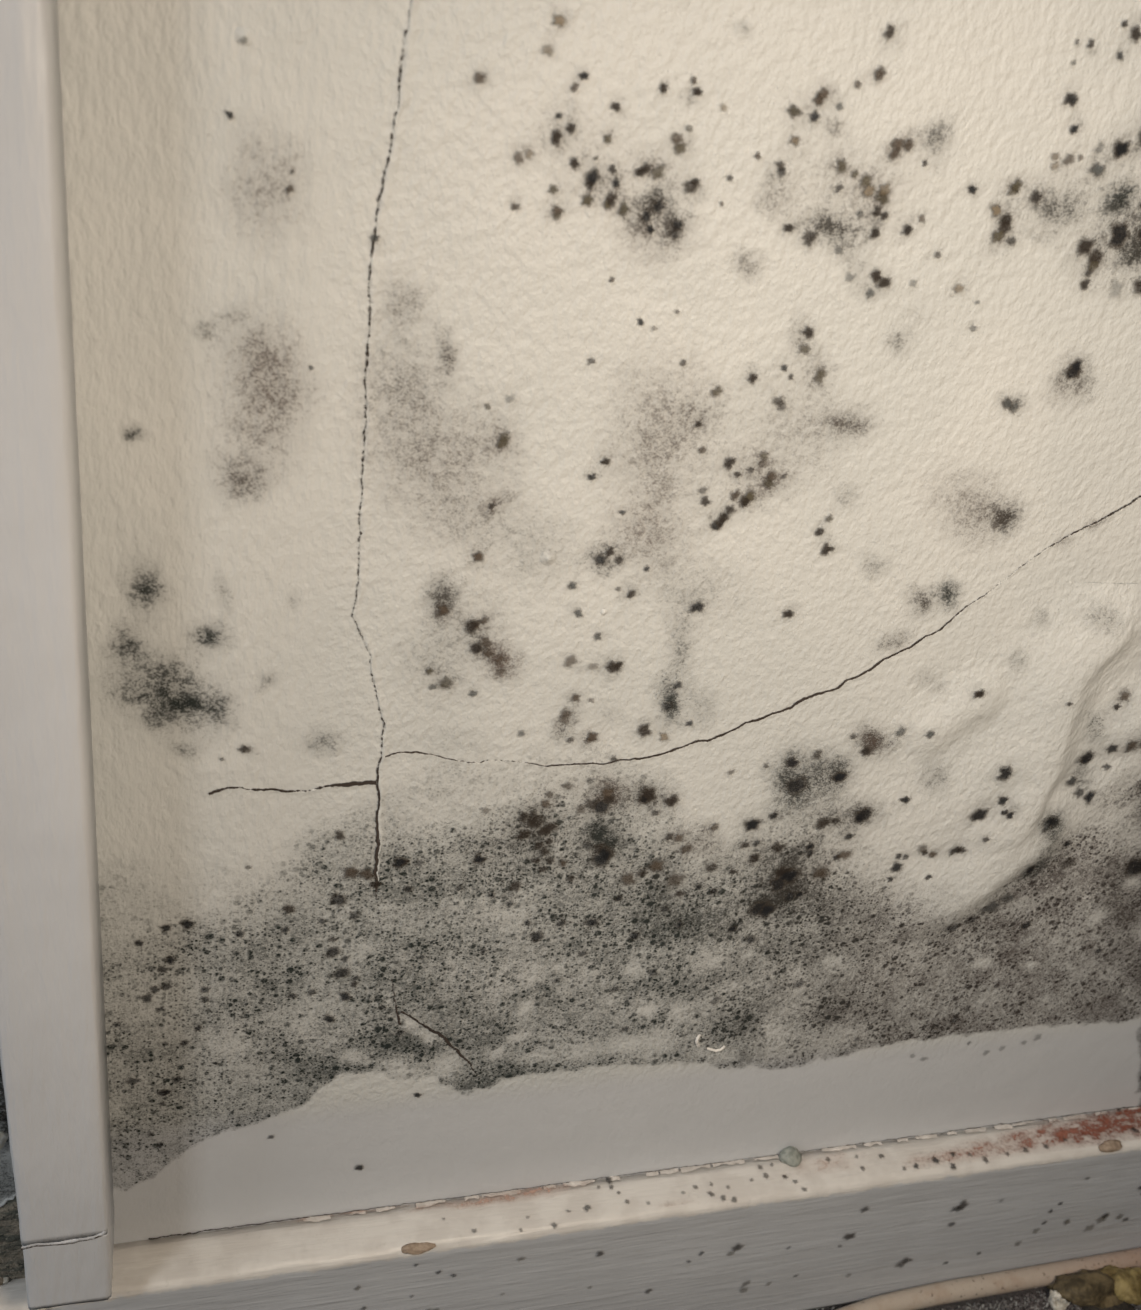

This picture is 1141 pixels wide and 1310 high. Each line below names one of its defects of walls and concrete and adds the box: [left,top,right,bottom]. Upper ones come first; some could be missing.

water stain [789,88,843,122]
water stain [1053,134,1141,177]
water stain [571,156,684,246]
water stain [784,160,891,253]
water stain [992,179,1074,245]
water stain [1078,183,1141,290]
water stain [711,452,787,530]
crack [208,0,1141,1079]
water stain [113,633,226,727]
water stain [103,742,1141,1185]
corrosion [918,1107,1141,1161]
peeling [401,1242,436,1255]